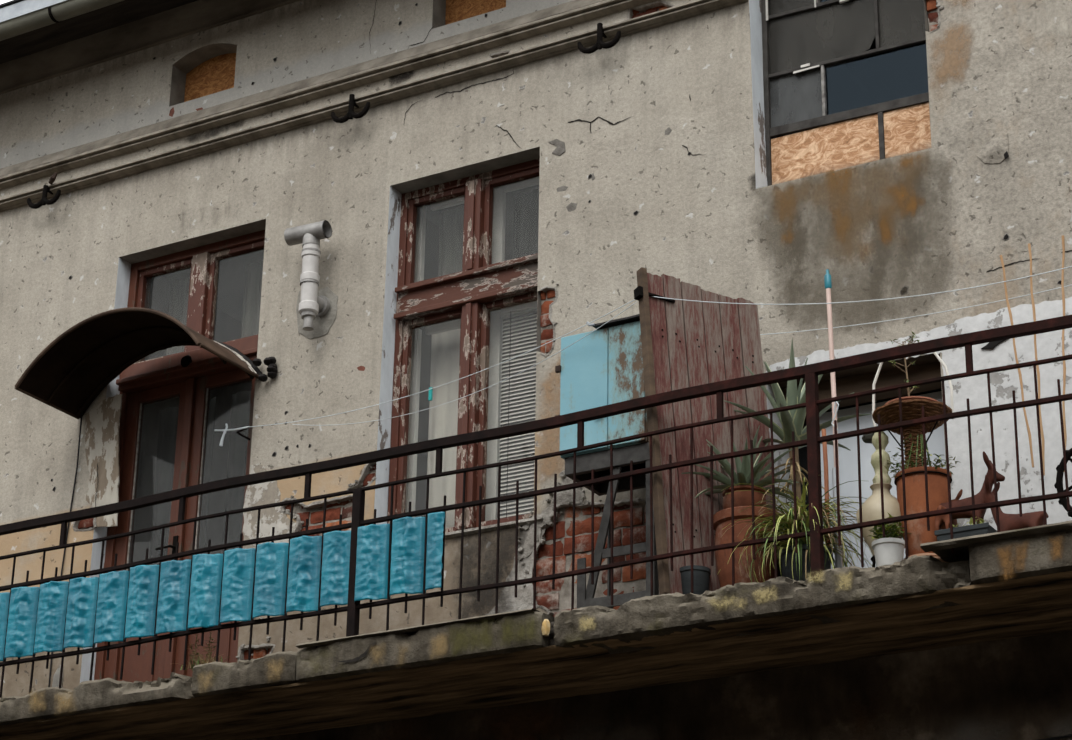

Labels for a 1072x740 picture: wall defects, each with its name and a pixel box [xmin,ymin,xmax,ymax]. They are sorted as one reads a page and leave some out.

spalling [926,0,944,33]
crack [404,71,514,120]
crack [568,116,633,132]
leakage [762,159,946,327]
flaking render [72,394,123,532]
flaking render [243,444,376,549]
spalling [518,470,646,617]